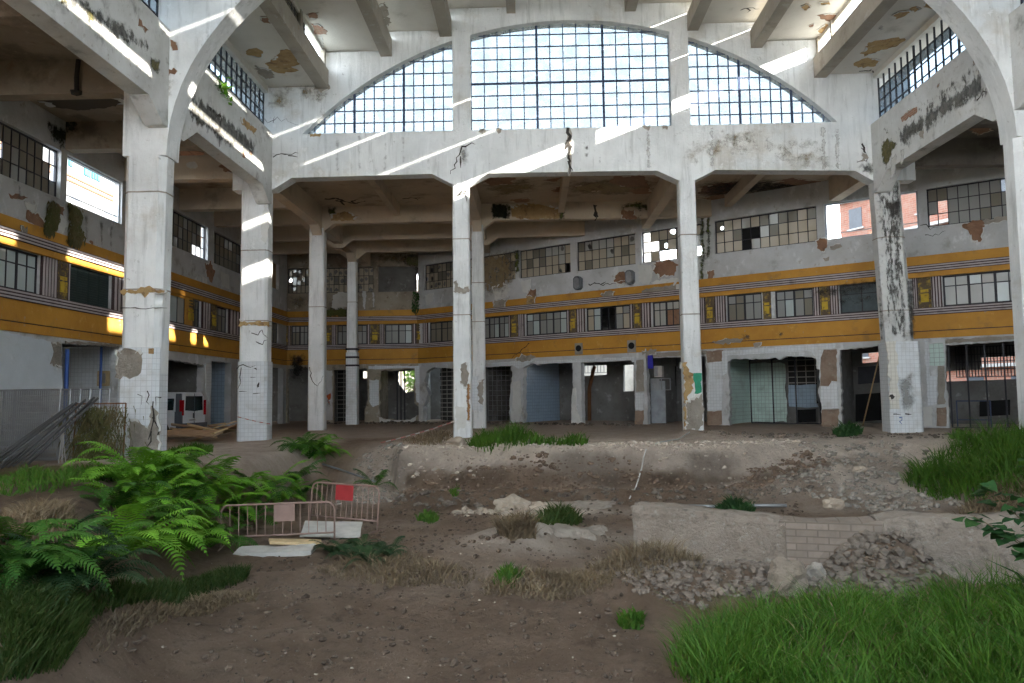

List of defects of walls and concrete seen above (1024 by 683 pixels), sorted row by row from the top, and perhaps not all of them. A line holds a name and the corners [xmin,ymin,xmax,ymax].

peeling [246,48,300,80]
peeling [853,37,906,68]
crack [450,143,474,201]
crack [565,127,573,176]
water stain [878,72,986,339]
spalling [962,216,1007,243]
spalling [638,259,679,293]
spalling [115,348,154,379]
crack [137,391,161,450]
spalling [682,362,705,430]